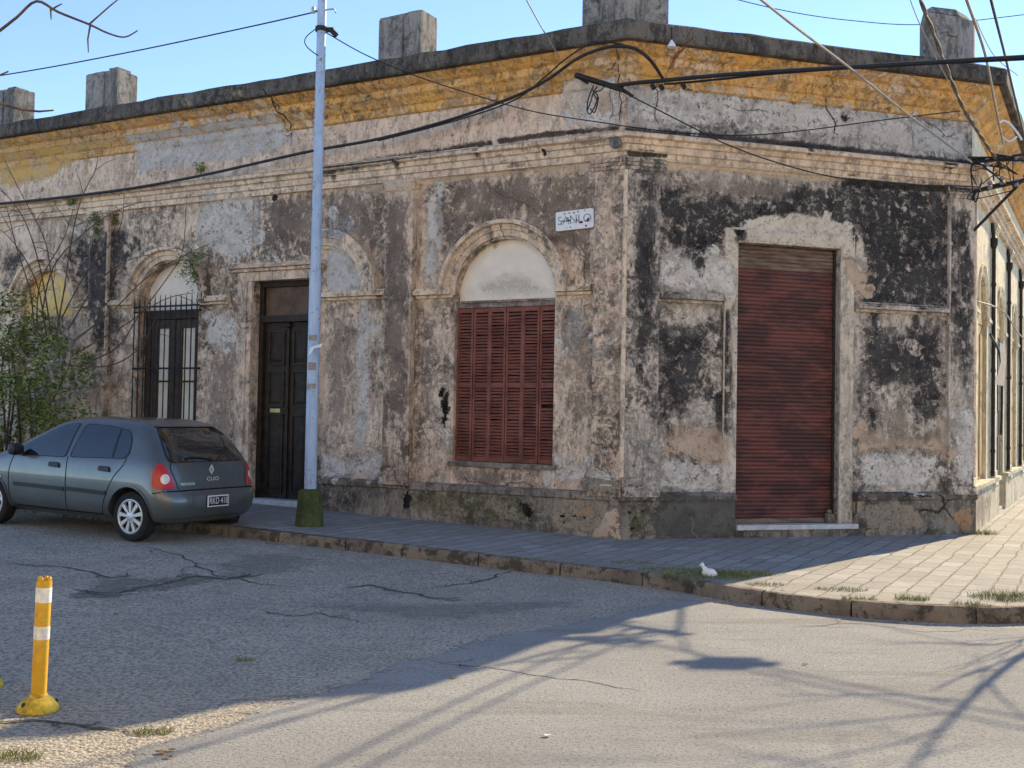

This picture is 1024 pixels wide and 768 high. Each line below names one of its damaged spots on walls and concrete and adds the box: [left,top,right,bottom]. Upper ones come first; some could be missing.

peeling [125,111,295,175]
leakage [62,226,141,376]
leakage [632,173,975,447]
peeling [657,422,735,493]
peeling [852,406,976,536]
crack [905,493,953,519]
crack [16,547,296,595]
crack [261,609,363,623]
crack [350,570,511,602]